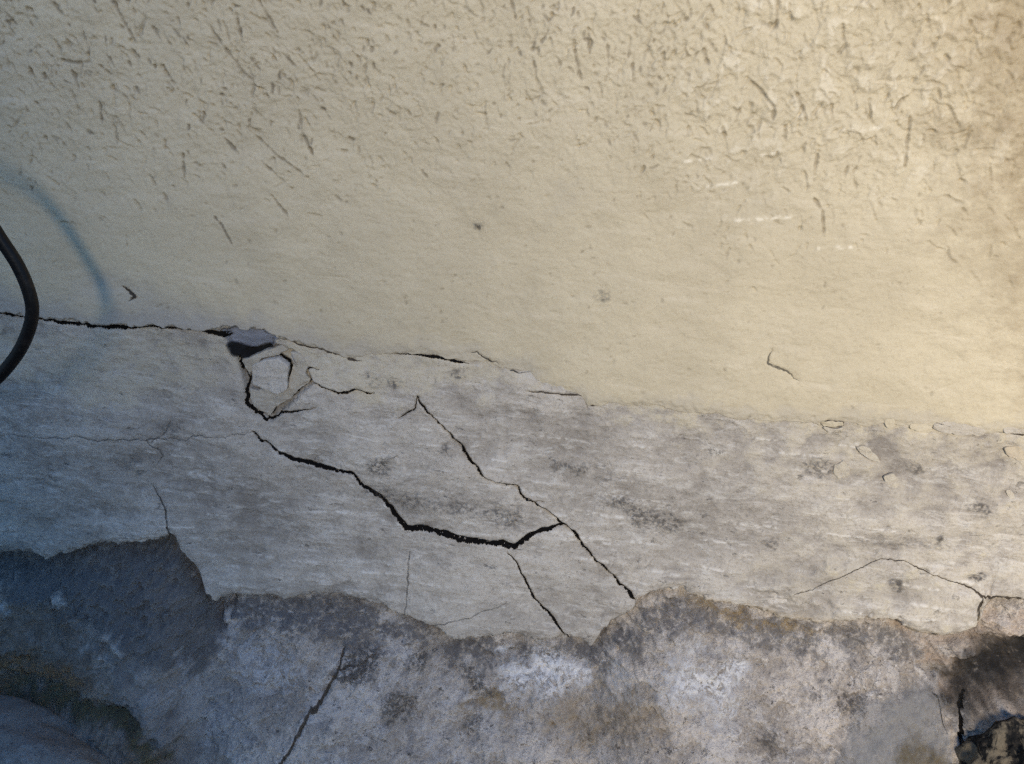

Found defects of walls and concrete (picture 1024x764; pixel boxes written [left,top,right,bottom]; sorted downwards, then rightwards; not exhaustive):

spalling [221,326,311,415]
crack [0,312,635,637]
spalling [0,534,440,682]
spalling [445,593,922,678]
crack [795,559,1021,639]
damp [856,636,1024,764]